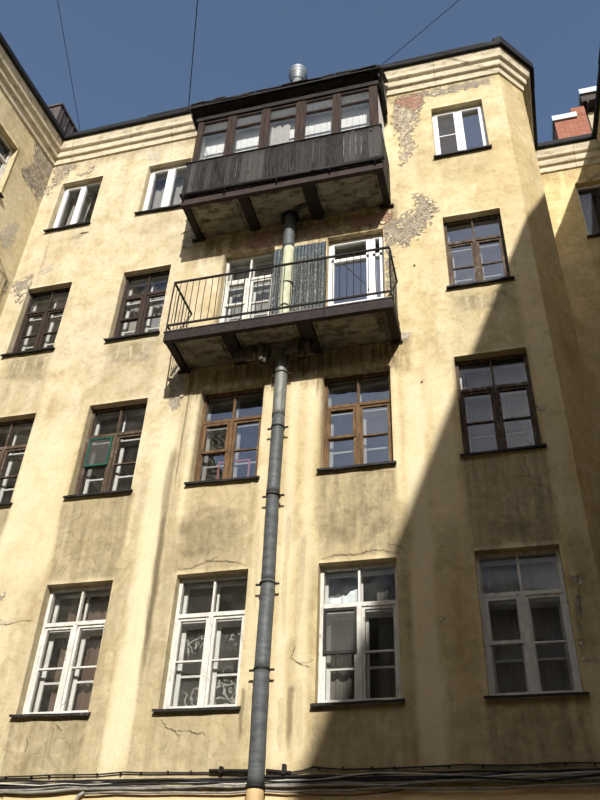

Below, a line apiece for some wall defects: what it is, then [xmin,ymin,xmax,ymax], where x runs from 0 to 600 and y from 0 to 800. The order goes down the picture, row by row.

flaking render [390,76,490,167]
flaking render [21,140,97,205]
flaking render [346,193,439,295]
flaking render [2,263,54,303]
flaking render [168,365,193,411]